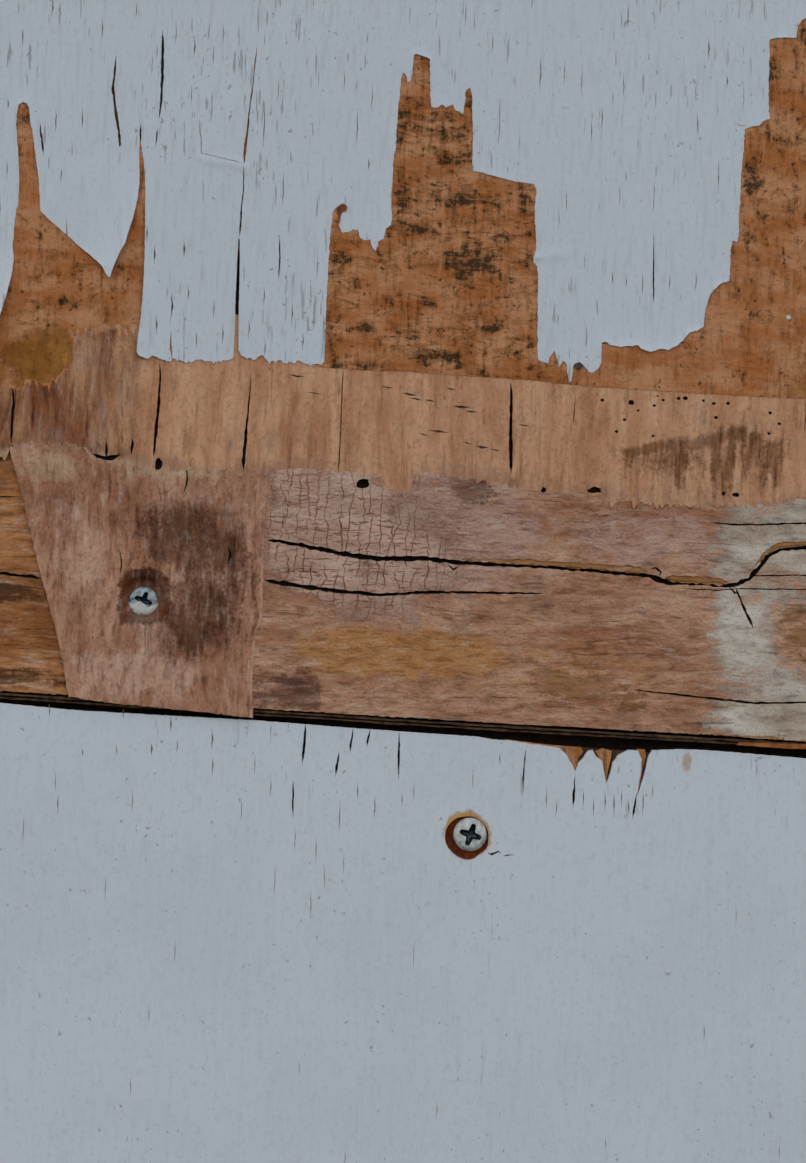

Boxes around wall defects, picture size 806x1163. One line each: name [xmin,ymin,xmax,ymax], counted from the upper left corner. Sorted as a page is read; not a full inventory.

peeling [0,102,145,393]
peeling [313,19,806,399]
leakage [135,510,253,656]
crack [265,522,806,628]
peeling [505,739,612,783]
peeling [635,749,646,799]
rust [445,810,491,860]